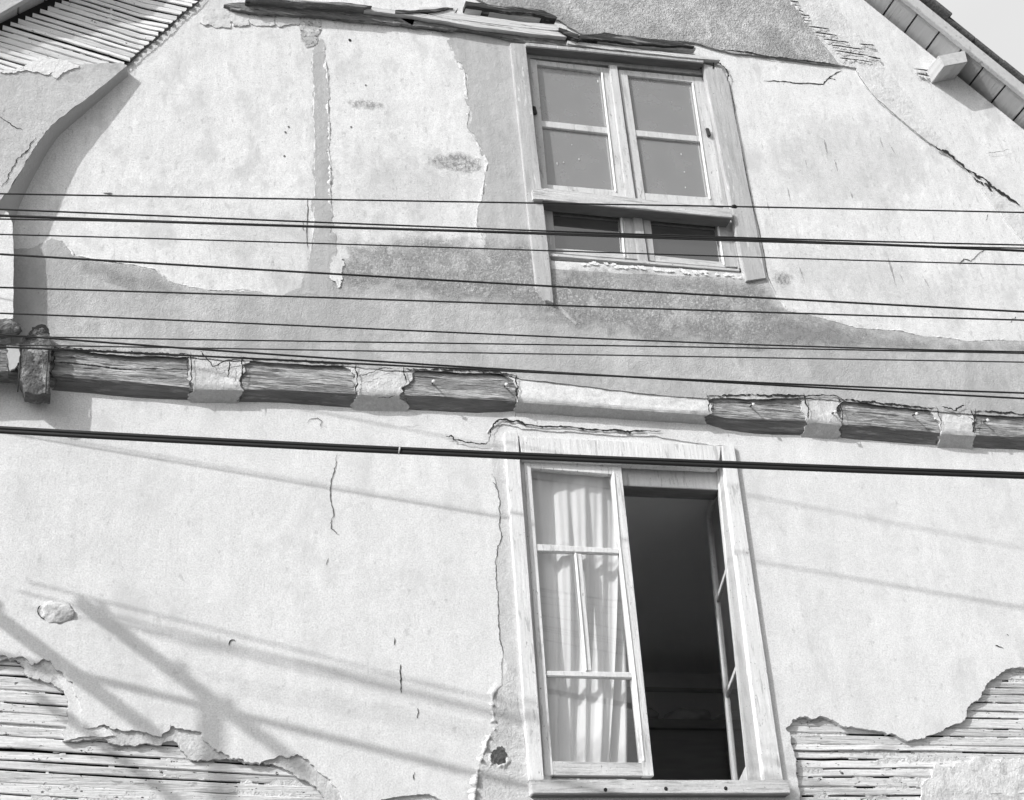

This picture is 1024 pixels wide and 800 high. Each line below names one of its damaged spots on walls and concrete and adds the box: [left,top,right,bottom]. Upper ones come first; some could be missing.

crack [713,50,1020,205]
peeling [0,0,1024,450]
crack [741,150,776,293]
crack [446,401,659,445]
crack [329,455,337,534]
crack [493,480,504,669]
spalling [0,660,325,800]
spalling [467,665,534,800]
spalling [786,668,1024,800]